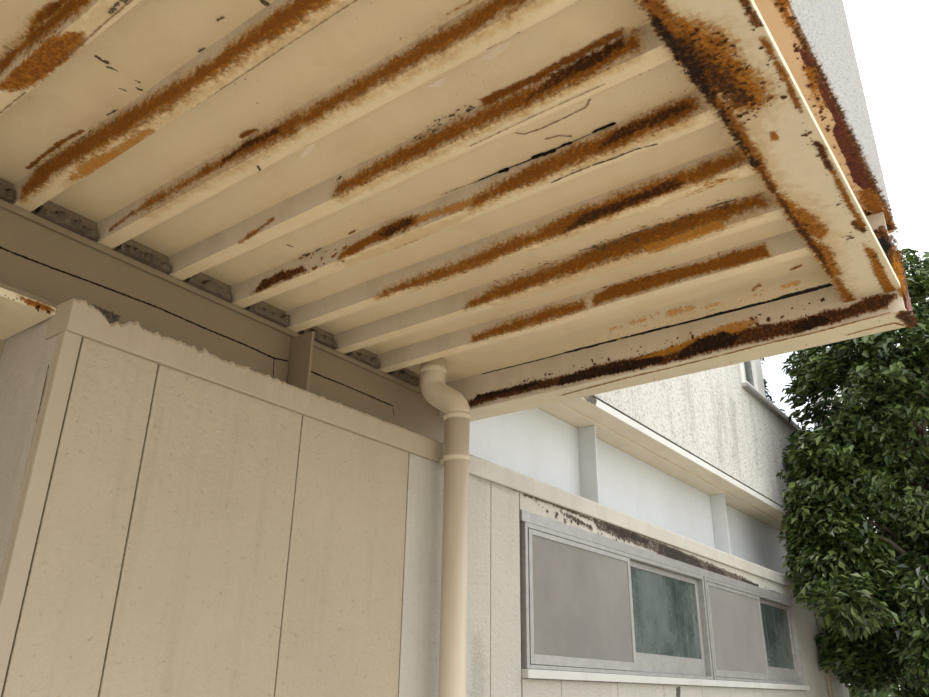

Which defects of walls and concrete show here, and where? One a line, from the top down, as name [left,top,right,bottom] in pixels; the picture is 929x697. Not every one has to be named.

corrosion [0,0,133,114]
corrosion [20,0,357,200]
corrosion [238,217,274,244]
corrosion [109,0,524,231]
crack [442,122,616,195]
corrosion [254,0,918,407]
spalling [92,305,120,323]
crack [0,246,288,377]
crack [311,371,394,415]